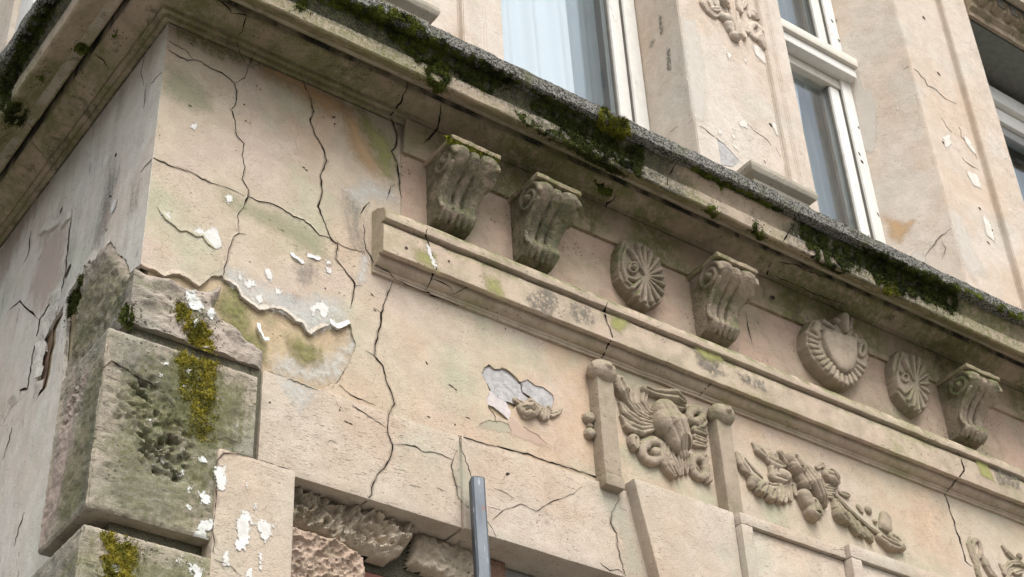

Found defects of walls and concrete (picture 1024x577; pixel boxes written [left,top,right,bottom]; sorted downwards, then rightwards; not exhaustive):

crack [12,222,71,391]
flaking render [34,229,351,401]
damp [215,286,265,357]
crack [141,1,596,536]
damp [889,221,911,240]
flaking render [482,366,553,447]
crack [97,360,287,575]
peeling [176,456,228,512]
peeling [193,519,214,540]
peeling [223,502,275,577]
crack [603,502,626,576]
crack [944,452,970,565]